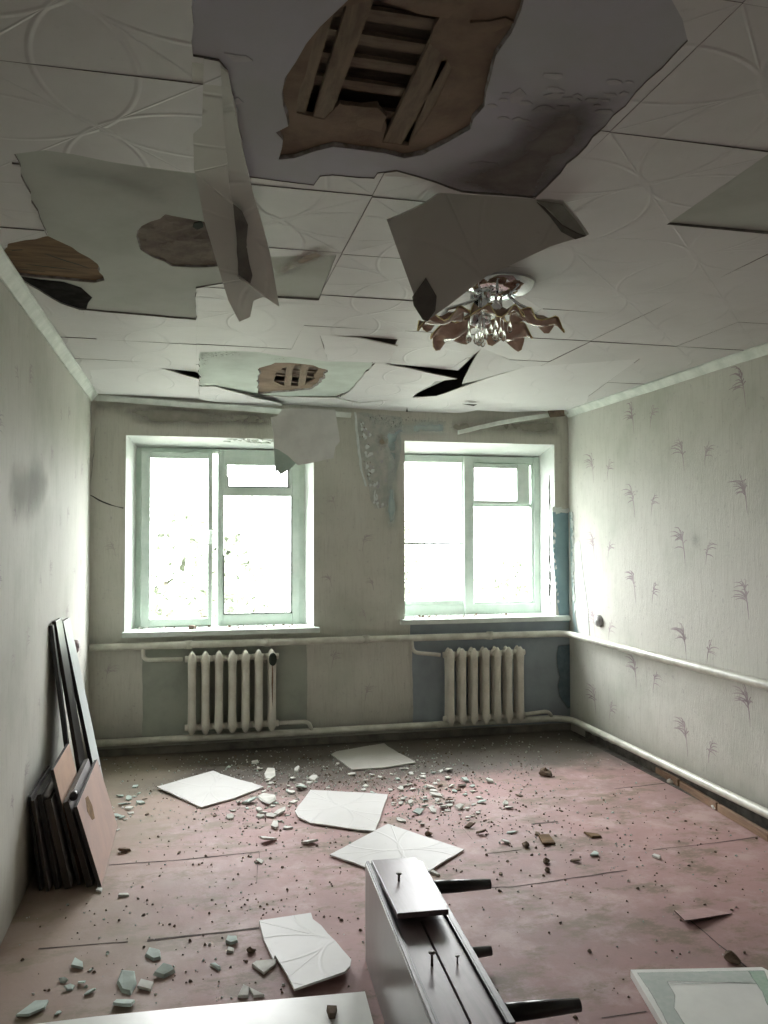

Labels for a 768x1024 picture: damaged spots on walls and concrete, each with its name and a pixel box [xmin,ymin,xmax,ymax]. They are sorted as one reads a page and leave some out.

flaking render [192,0,687,192]
flaking render [16,150,223,318]
leakage [457,106,590,239]
flaking render [198,351,373,397]
crack [90,429,124,509]
flaking render [354,412,402,509]